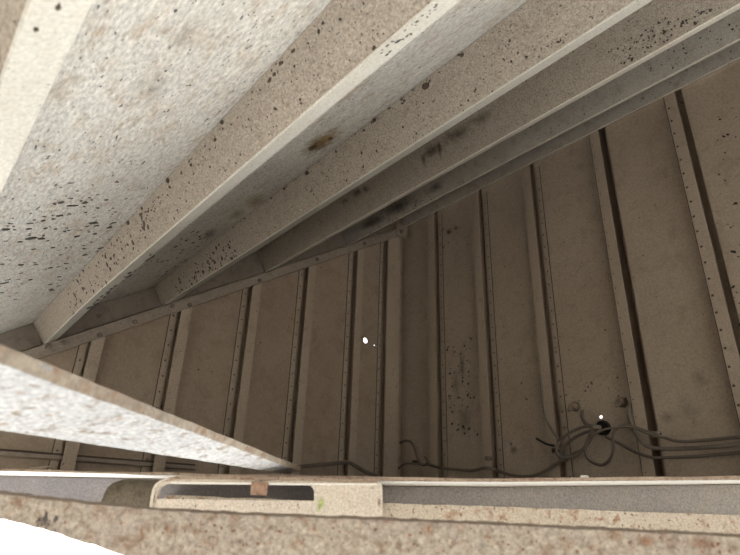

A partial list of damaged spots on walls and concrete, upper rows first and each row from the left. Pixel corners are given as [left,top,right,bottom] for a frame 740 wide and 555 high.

corrosion [311,134,332,150]